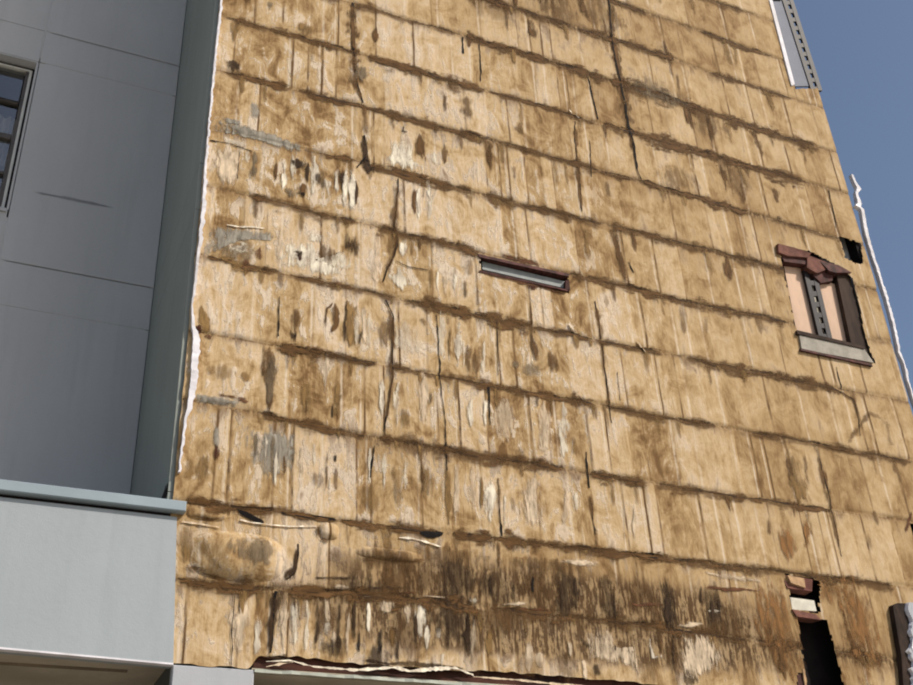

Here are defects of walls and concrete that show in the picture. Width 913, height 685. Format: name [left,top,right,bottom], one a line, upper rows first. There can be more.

peeling [215,118,358,209]
crack [347,2,375,174]
damp [227,0,817,215]
crack [573,0,642,210]
peeling [206,224,359,275]
damp [486,191,787,327]
peeling [247,428,316,484]
damp [260,301,375,437]
crack [370,178,427,477]
damp [405,296,662,375]
damp [393,346,716,437]
damp [178,495,894,685]